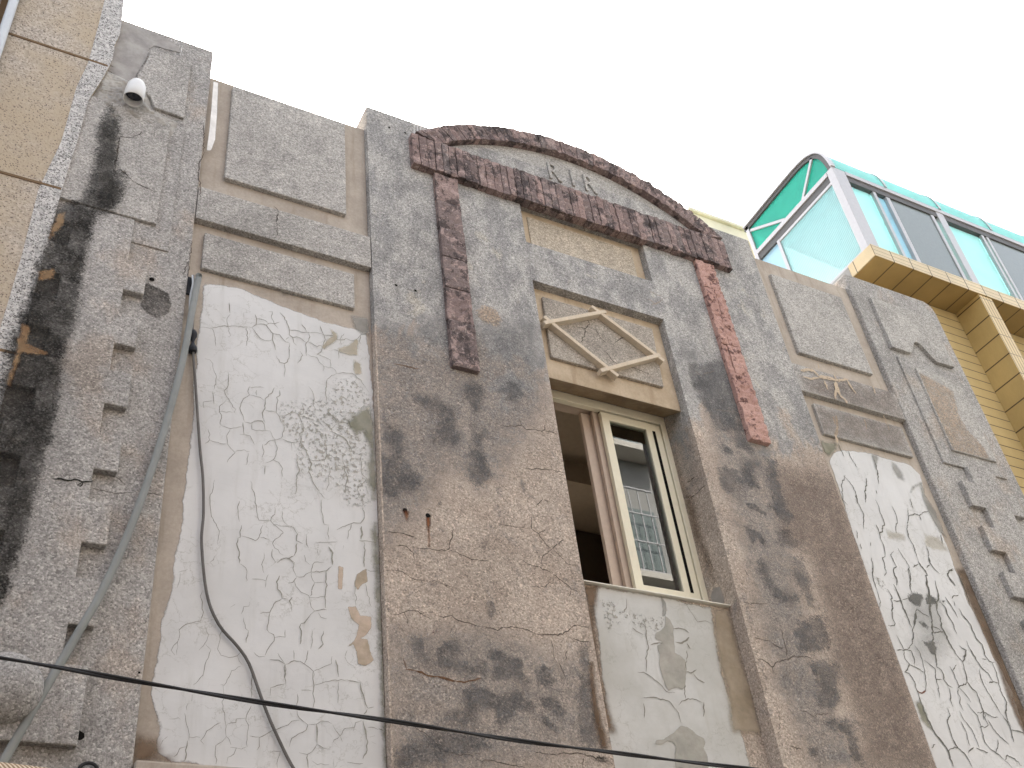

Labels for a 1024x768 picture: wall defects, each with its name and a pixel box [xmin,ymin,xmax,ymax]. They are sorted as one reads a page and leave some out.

spalling [7,324,46,384]
leakage [0,105,127,604]
leakage [323,305,540,514]
leakage [801,365,856,404]
crack [54,477,160,496]
crack [161,304,488,765]
peeling [338,566,368,589]
peeling [348,607,373,666]
crack [394,610,589,679]
crack [623,572,764,722]
crack [838,444,1023,768]
spalling [656,726,709,768]